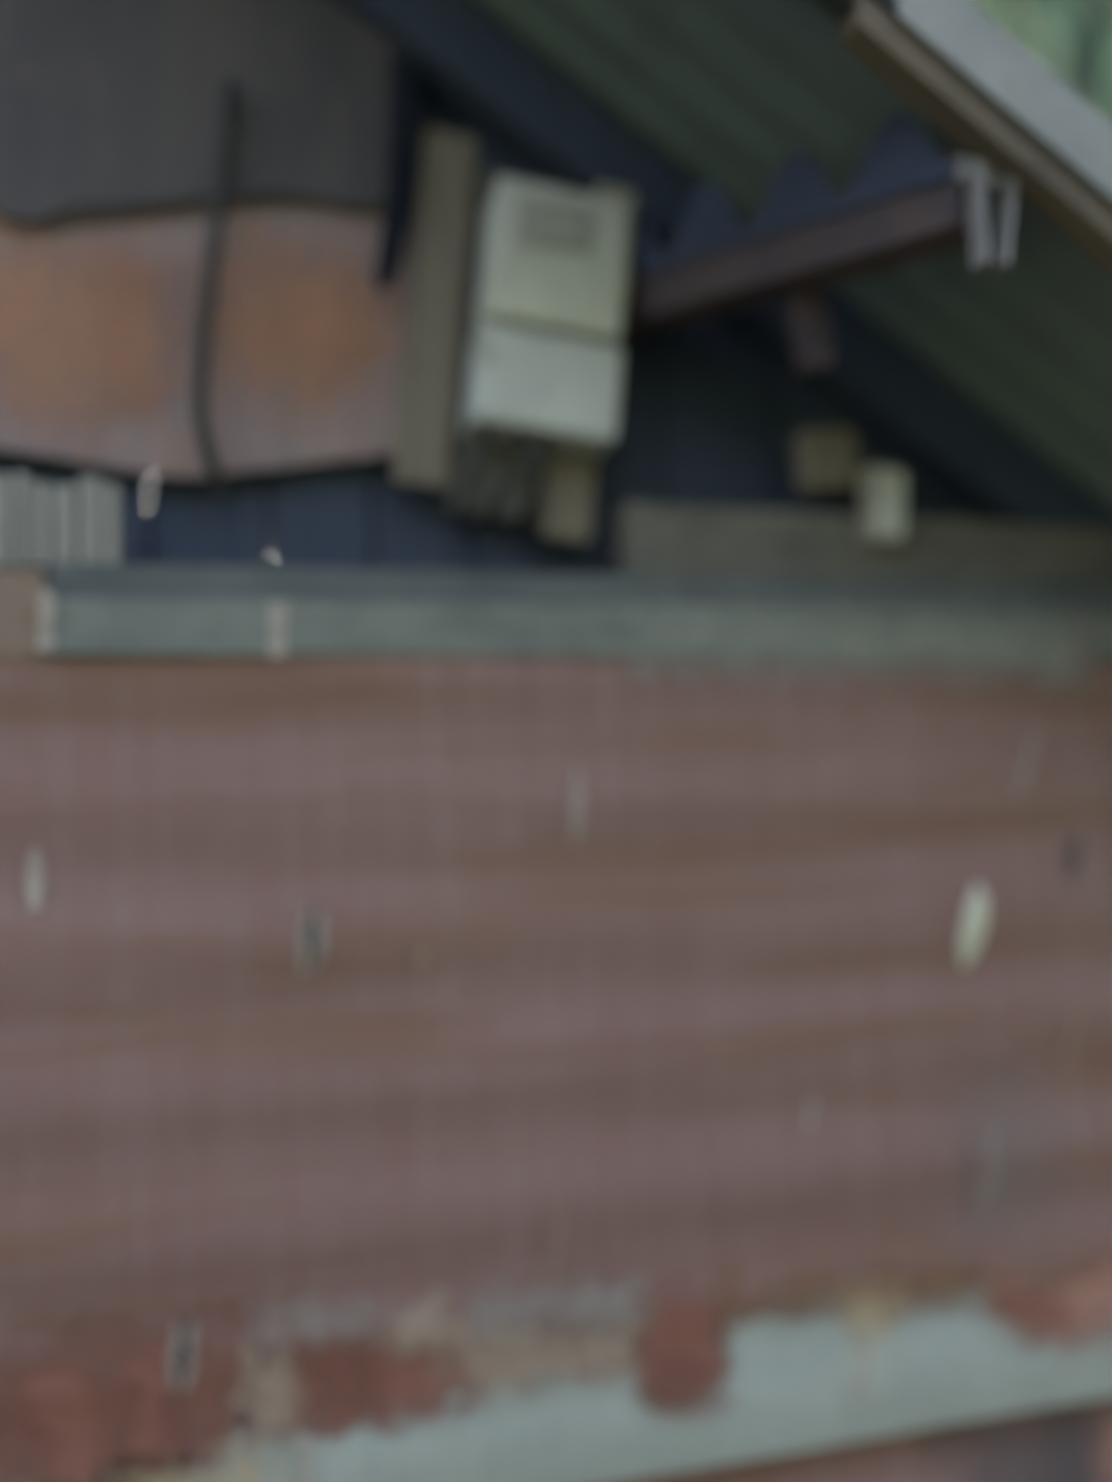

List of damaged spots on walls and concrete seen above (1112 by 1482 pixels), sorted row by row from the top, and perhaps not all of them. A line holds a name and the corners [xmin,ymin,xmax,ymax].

peeling [159,1280,1112,1482]